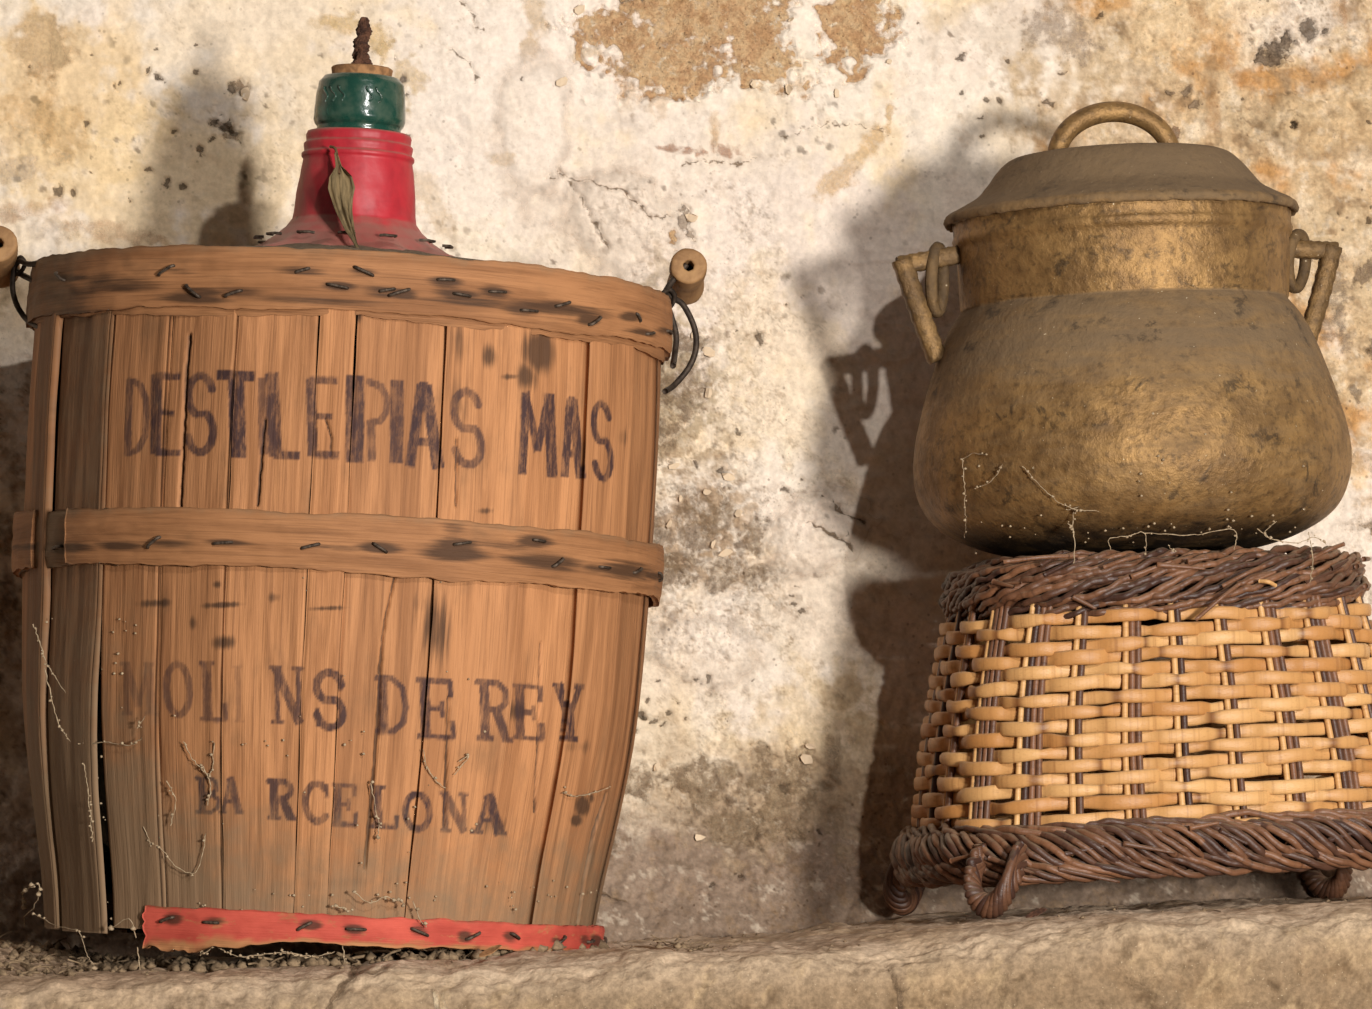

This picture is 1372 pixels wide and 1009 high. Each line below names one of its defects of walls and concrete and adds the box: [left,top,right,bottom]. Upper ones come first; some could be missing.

flaking render [572,0,919,102]
crack [326,965,386,1009]